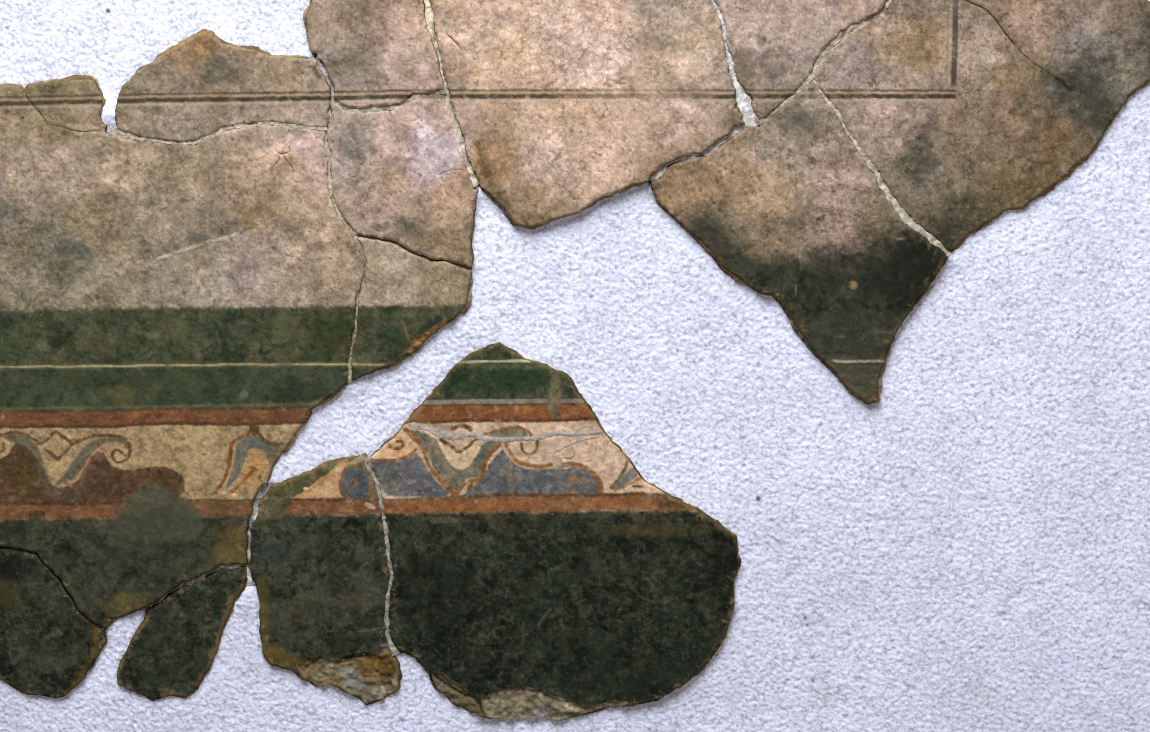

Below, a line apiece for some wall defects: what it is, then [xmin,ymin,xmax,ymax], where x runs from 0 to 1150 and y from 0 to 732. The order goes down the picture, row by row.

crack [25,0,479,382]
crack [650,0,952,257]
crack [150,485,269,608]
crack [361,453,400,656]
crack [427,668,471,696]